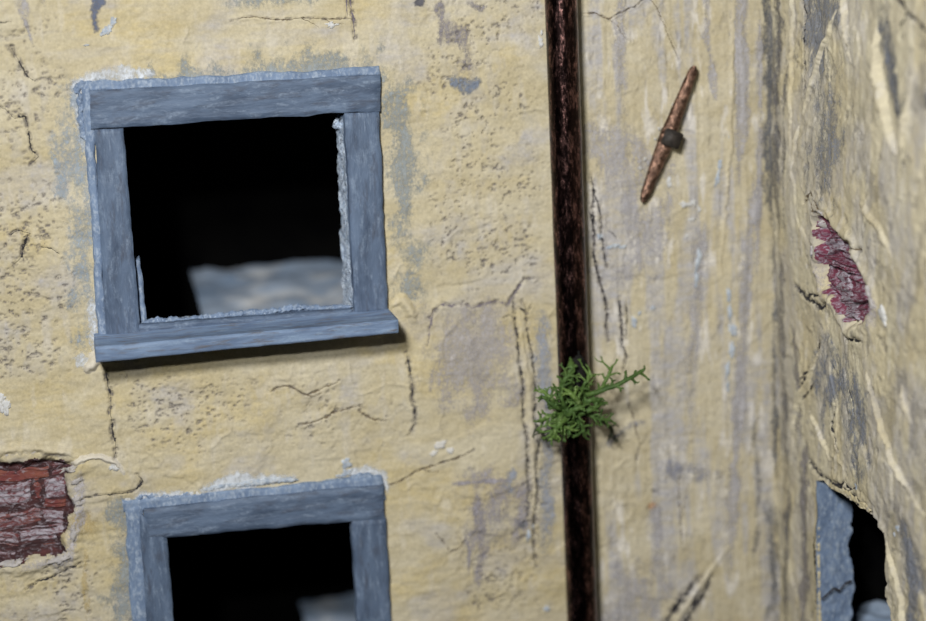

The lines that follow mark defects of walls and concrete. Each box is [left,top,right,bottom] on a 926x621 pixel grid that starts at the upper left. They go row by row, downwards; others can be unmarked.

crack [231,0,355,38]
leakage [804,0,840,75]
leakage [878,17,901,120]
crack [589,173,628,367]
flaking render [810,210,887,327]
crack [106,373,116,454]
crack [407,359,416,432]
crack [427,278,540,566]
leakage [814,337,870,482]
flaking render [0,458,84,568]
leakage [765,446,811,621]
leakage [901,519,924,621]